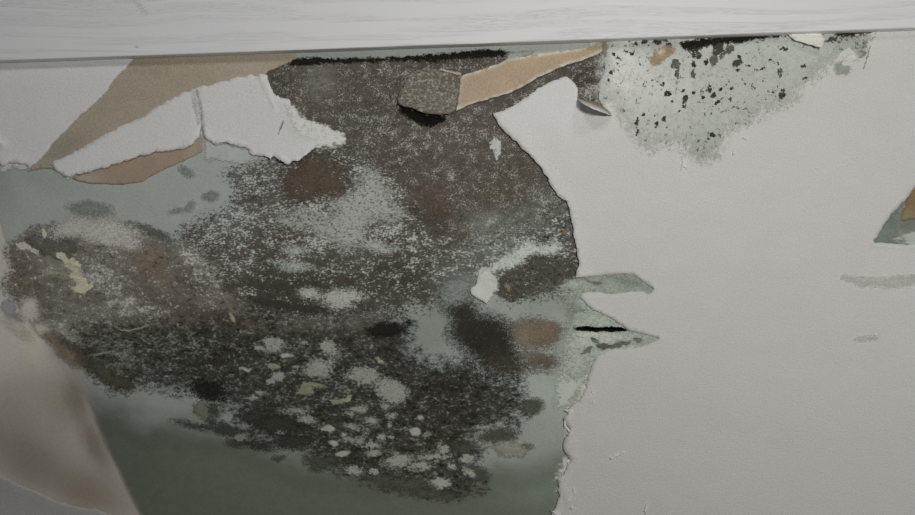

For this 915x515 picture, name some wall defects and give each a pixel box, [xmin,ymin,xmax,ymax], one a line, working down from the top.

water stain [824,32,871,43]
water stain [671,59,681,78]
water stain [680,35,788,79]
water stain [660,82,733,112]
spalling [398,103,446,127]
peeling [489,136,501,160]
peeling [15,242,39,255]
water stain [0,40,673,515]
peeling [470,267,511,303]
crack [573,325,627,333]
spalling [552,274,659,382]